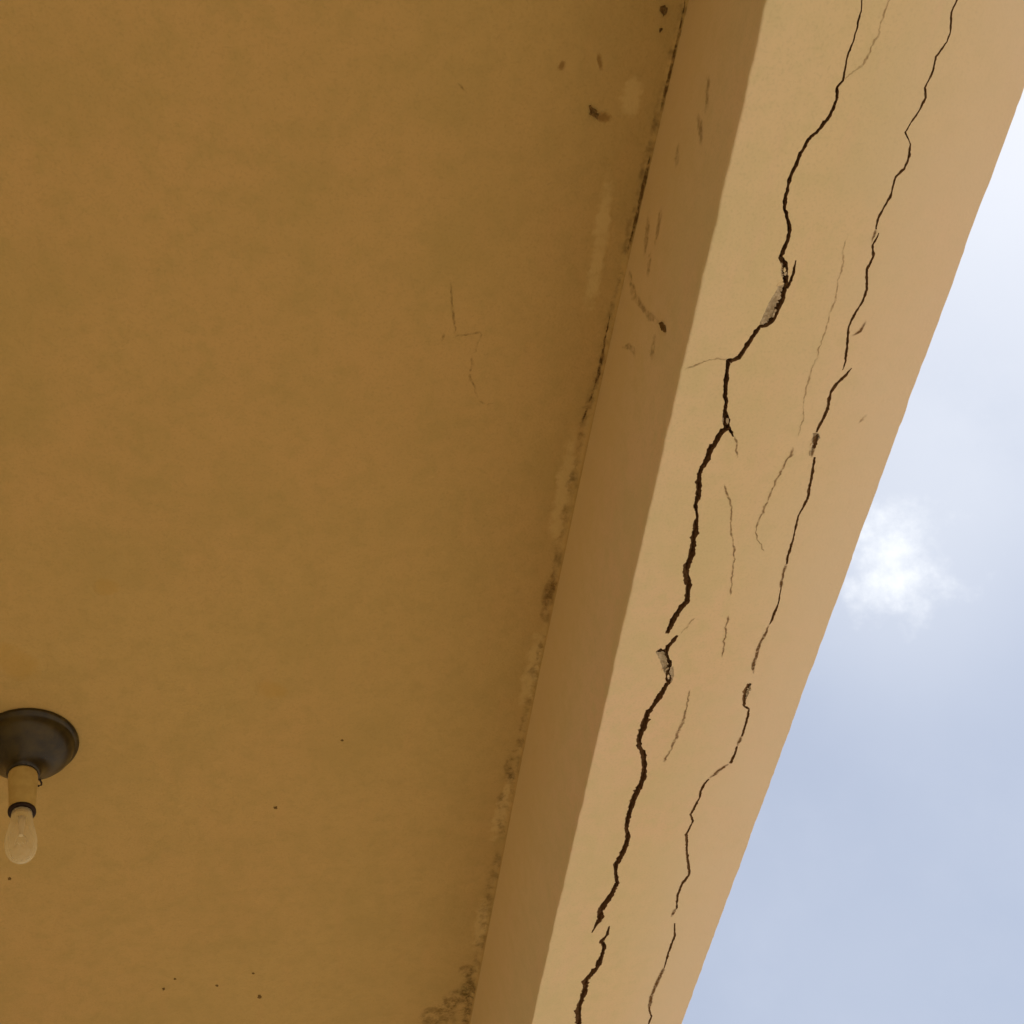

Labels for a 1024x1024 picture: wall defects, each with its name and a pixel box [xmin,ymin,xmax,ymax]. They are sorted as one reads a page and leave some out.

crack [574,0,958,1024]
flaking render [760,263,787,325]